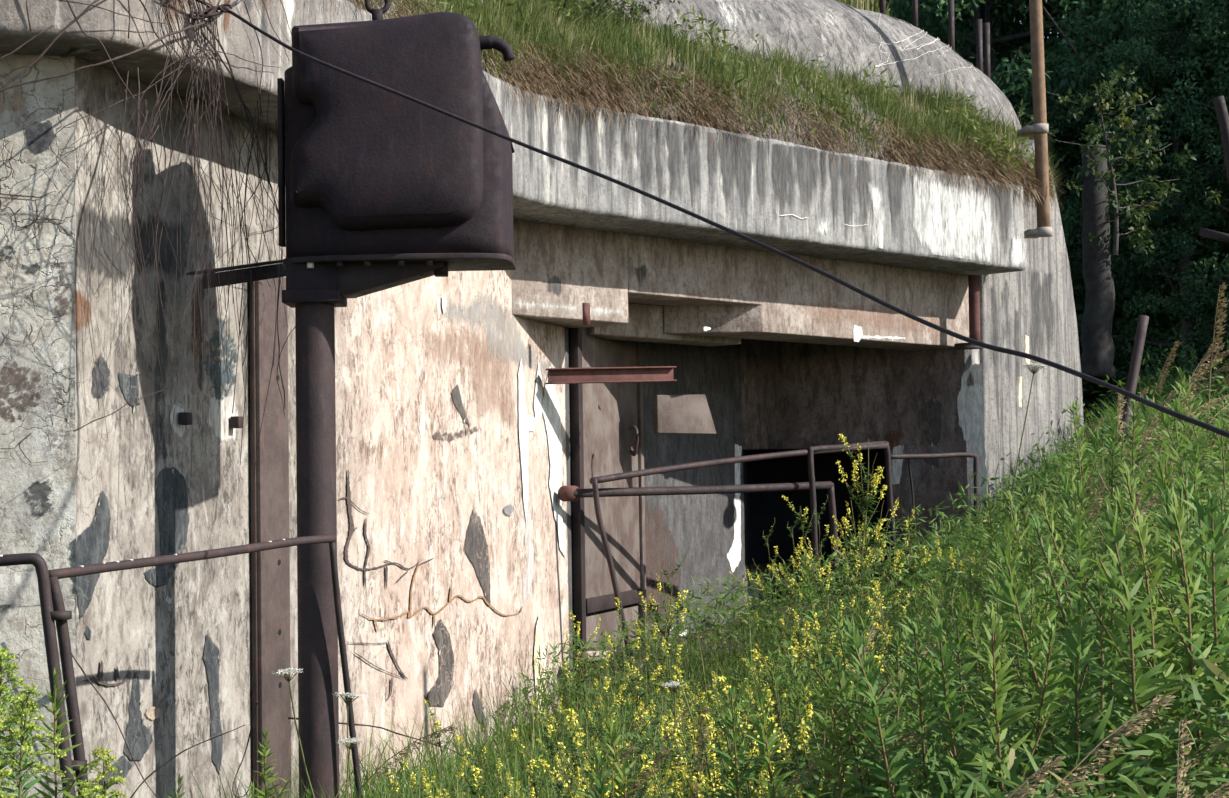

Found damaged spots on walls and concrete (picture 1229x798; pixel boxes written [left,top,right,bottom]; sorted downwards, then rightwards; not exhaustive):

crack [0,138,67,239]
crack [0,324,61,346]
water stain [527,95,1053,505]
crack [0,433,48,465]